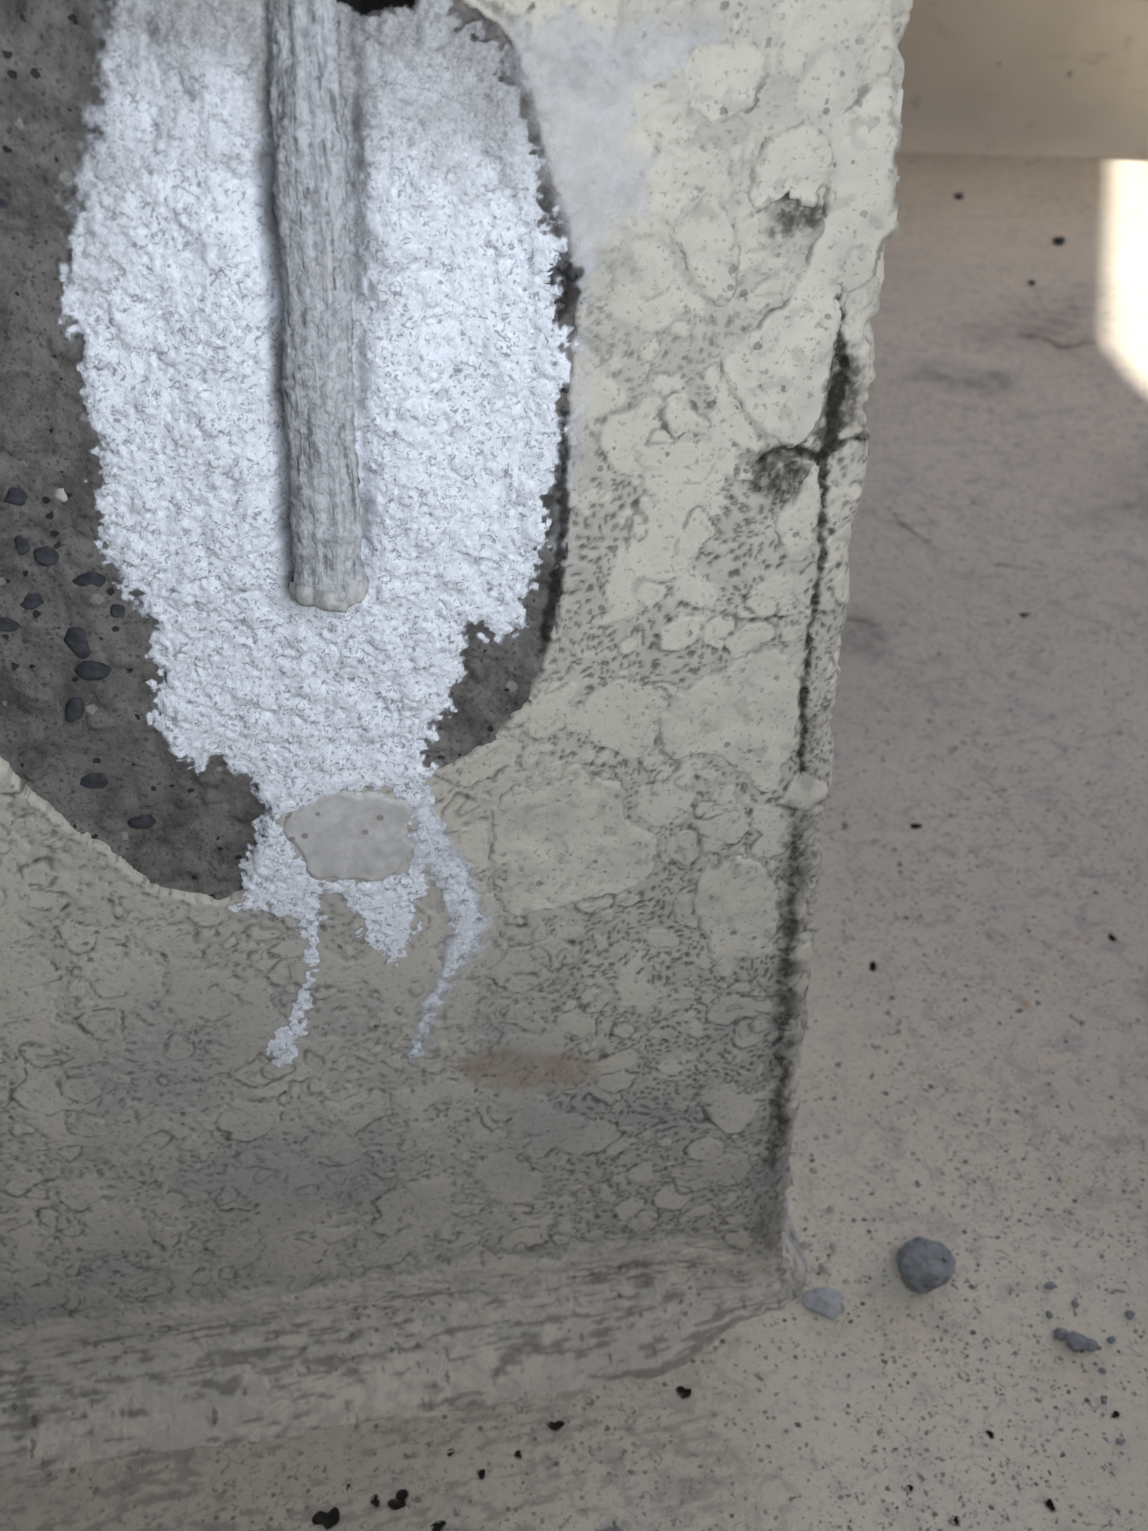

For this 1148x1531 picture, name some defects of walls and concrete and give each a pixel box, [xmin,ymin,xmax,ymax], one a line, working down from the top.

spalling [447,0,572,257]
spalling [0,0,414,900]
water stain [58,0,621,1068]
spalling [417,274,582,770]
crack [757,283,869,772]
spalling [311,1507,340,1530]
spalling [370,1489,408,1510]
spalling [430,1521,446,1531]